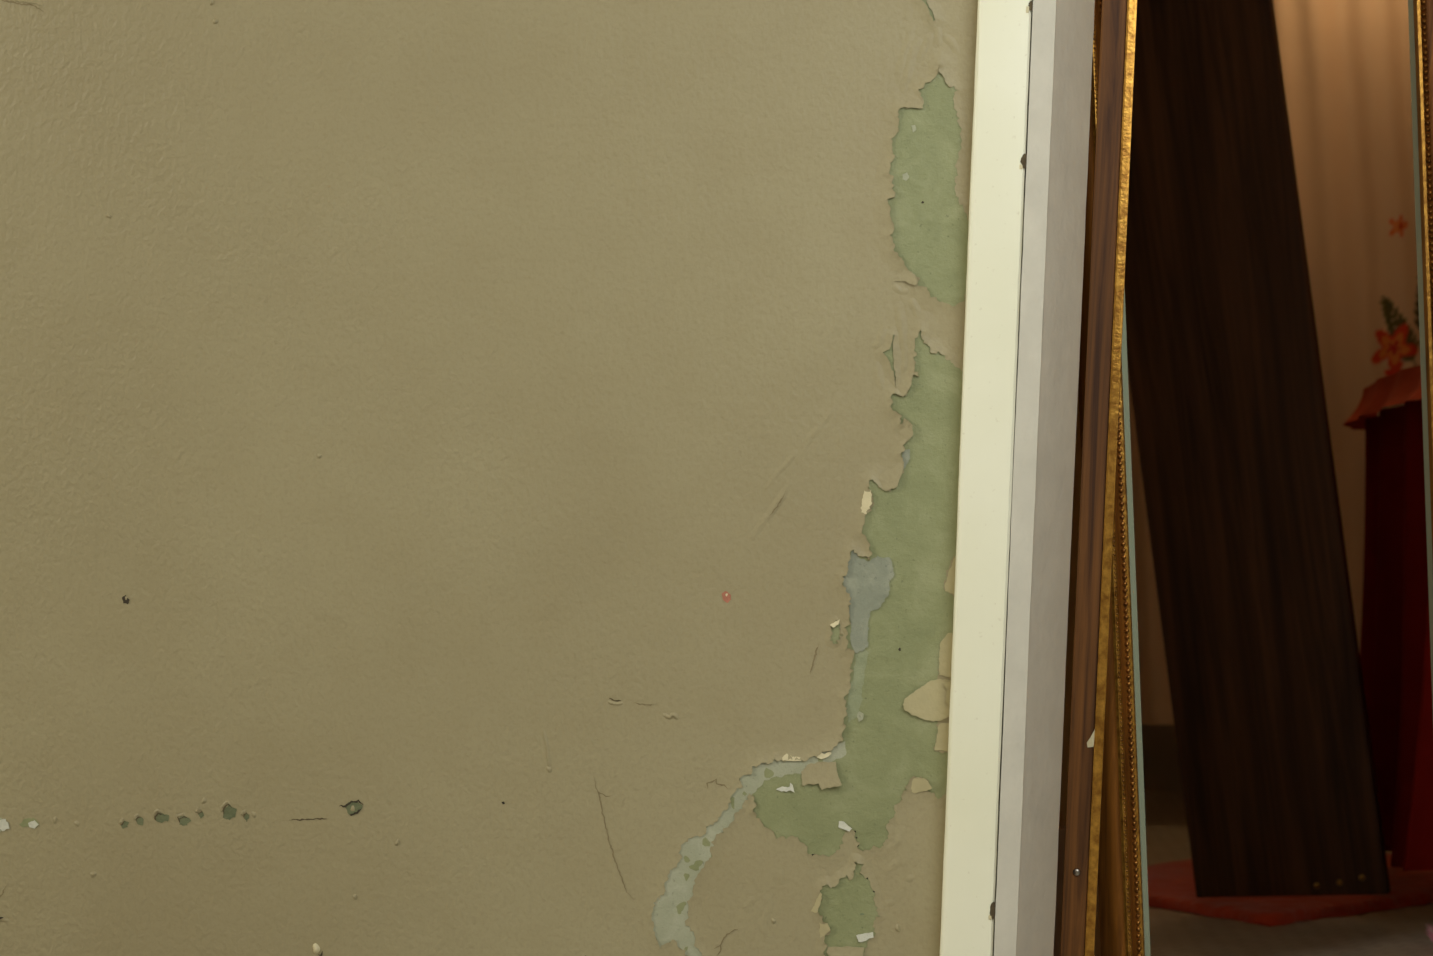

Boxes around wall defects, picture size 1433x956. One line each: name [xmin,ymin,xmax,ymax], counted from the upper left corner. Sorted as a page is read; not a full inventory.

peeling [639,44,973,956]
peeling [340,800,363,816]
peeling [0,818,39,832]